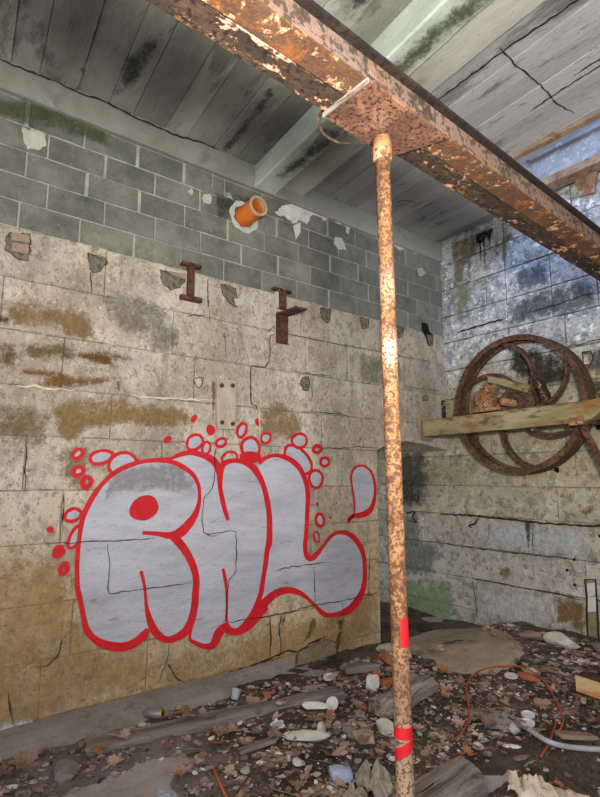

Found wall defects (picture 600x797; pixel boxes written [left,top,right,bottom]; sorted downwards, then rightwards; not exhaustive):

water stain [397,0,482,72]
crack [438,0,600,112]
crack [0,59,218,150]
water stain [278,128,347,176]
peeling [249,195,361,239]
spalling [5,232,31,261]
spalling [87,253,108,273]
spalling [160,269,186,291]
water stain [0,302,92,338]
water stain [27,344,126,364]
crack [250,326,381,449]
crack [201,447,379,673]